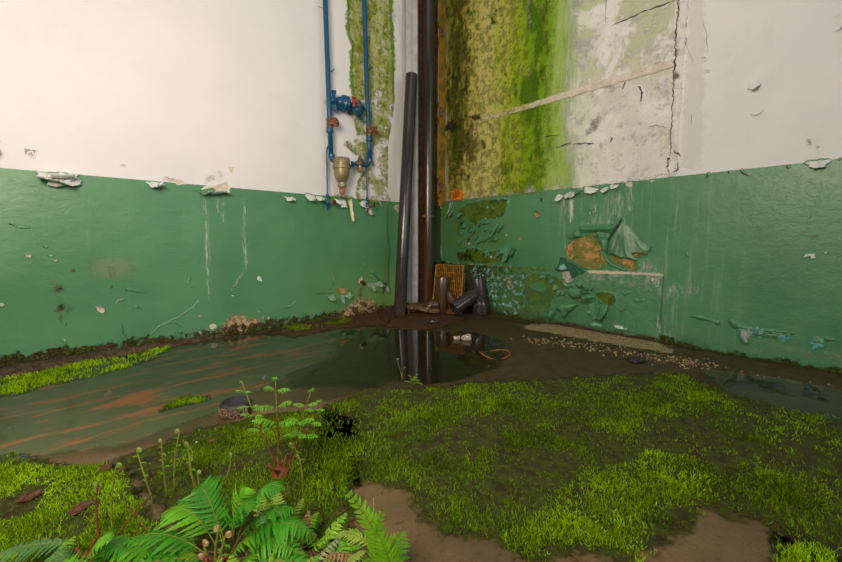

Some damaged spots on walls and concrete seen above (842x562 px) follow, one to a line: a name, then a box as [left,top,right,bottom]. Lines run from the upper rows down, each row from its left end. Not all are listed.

crack [605,0,693,172]
flaking render [23,147,39,160]
peeling [35,170,82,187]
flaking render [143,175,187,188]
peeling [198,166,234,195]
crack [706,168,752,179]
peeling [440,197,663,336]
peeling [321,270,391,304]
peeling [690,314,793,346]
peeling [0,311,350,457]